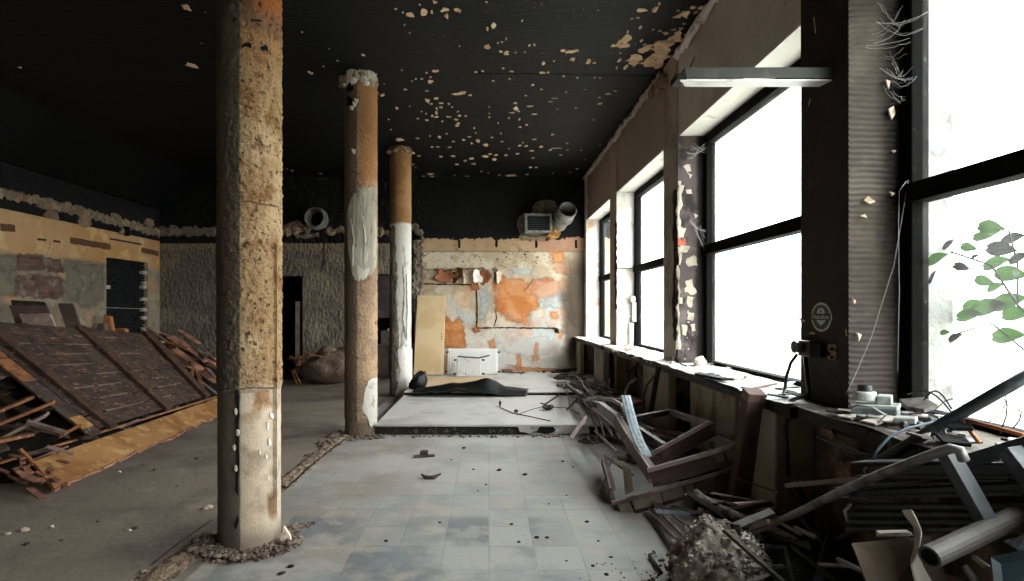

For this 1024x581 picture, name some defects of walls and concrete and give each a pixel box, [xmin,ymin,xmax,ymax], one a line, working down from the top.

spalling [336,60,385,110]
peeling [387,0,719,180]
flaking render [0,187,216,238]
flaking render [15,254,64,299]
peeling [282,185,563,396]
flaking render [672,164,697,349]
peeling [362,377,377,427]